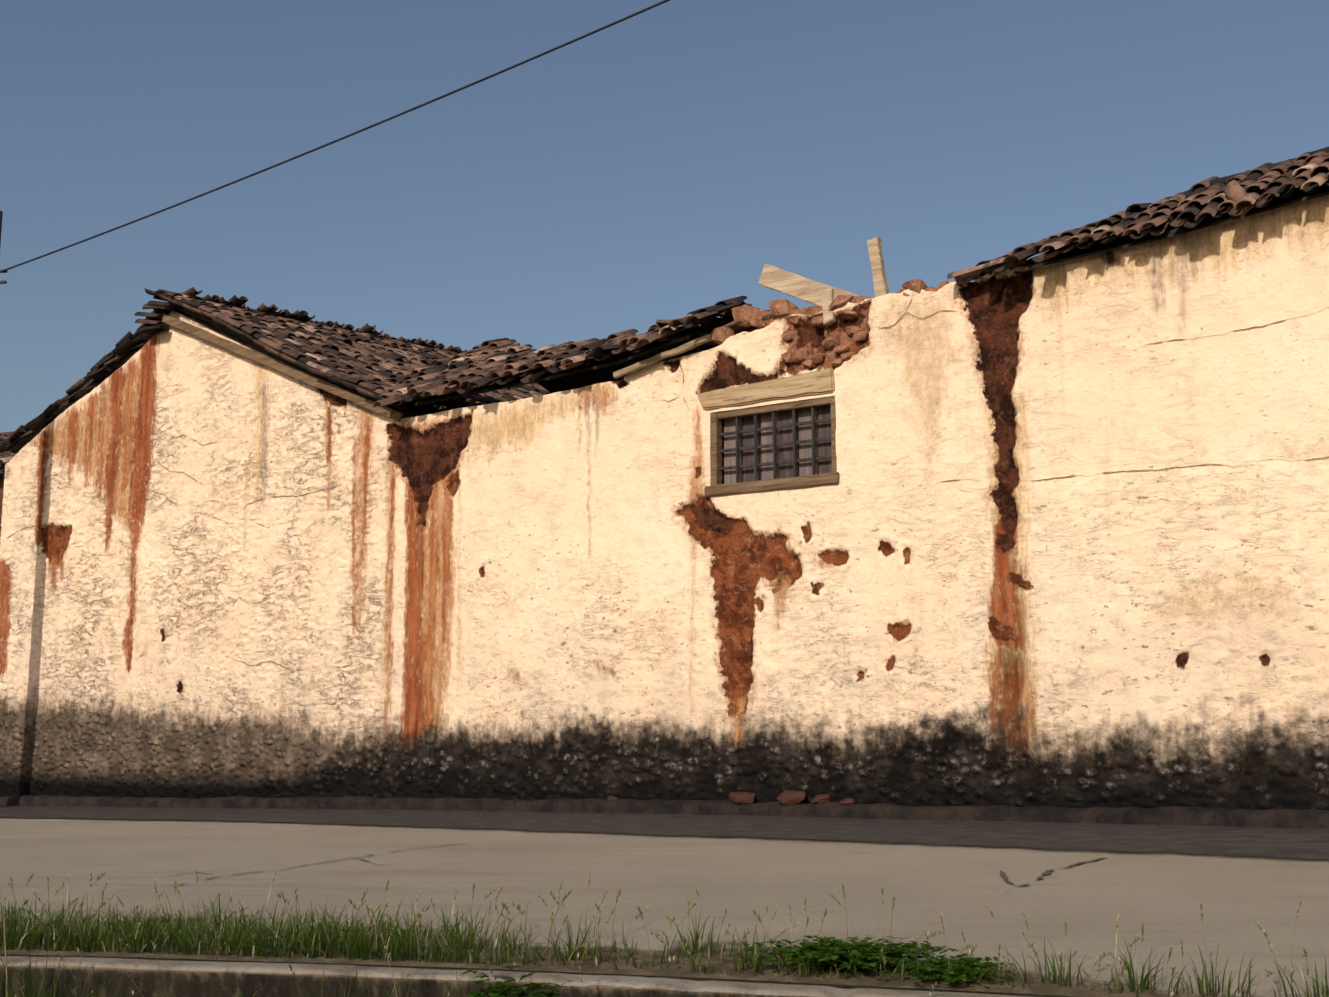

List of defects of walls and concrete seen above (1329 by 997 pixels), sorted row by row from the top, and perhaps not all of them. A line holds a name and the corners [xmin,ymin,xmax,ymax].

spalling [656,300,871,394]
spalling [958,267,1033,537]
crack [1146,307,1329,345]
corrosion [34,336,157,672]
corrosion [351,409,373,629]
corrosion [384,459,459,744]
spalling [383,410,473,526]
spalling [675,494,824,741]
spalling [818,549,849,567]
spalling [885,619,911,671]
crack [1026,456,1329,481]
damp [0,696,1329,810]